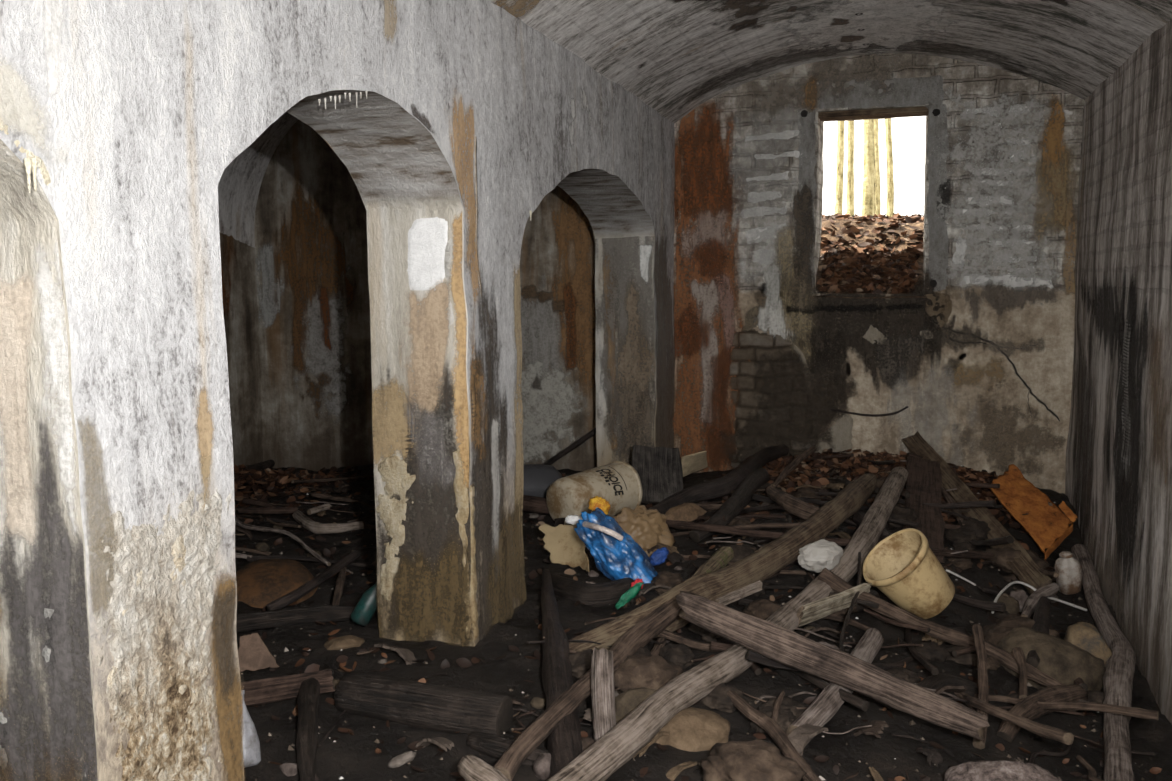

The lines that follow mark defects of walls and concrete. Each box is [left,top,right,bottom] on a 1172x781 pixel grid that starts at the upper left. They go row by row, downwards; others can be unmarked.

efflorescence [0,66,51,193]
leakage [0,249,115,781]
corrosion [221,227,236,315]
corrosion [273,180,360,373]
peeling [376,454,416,601]
corrosion [451,100,488,488]
corrosion [547,198,616,400]
corrosion [673,103,754,473]
spalling [721,292,857,469]
leakage [757,179,1149,679]
leakage [211,576,244,781]